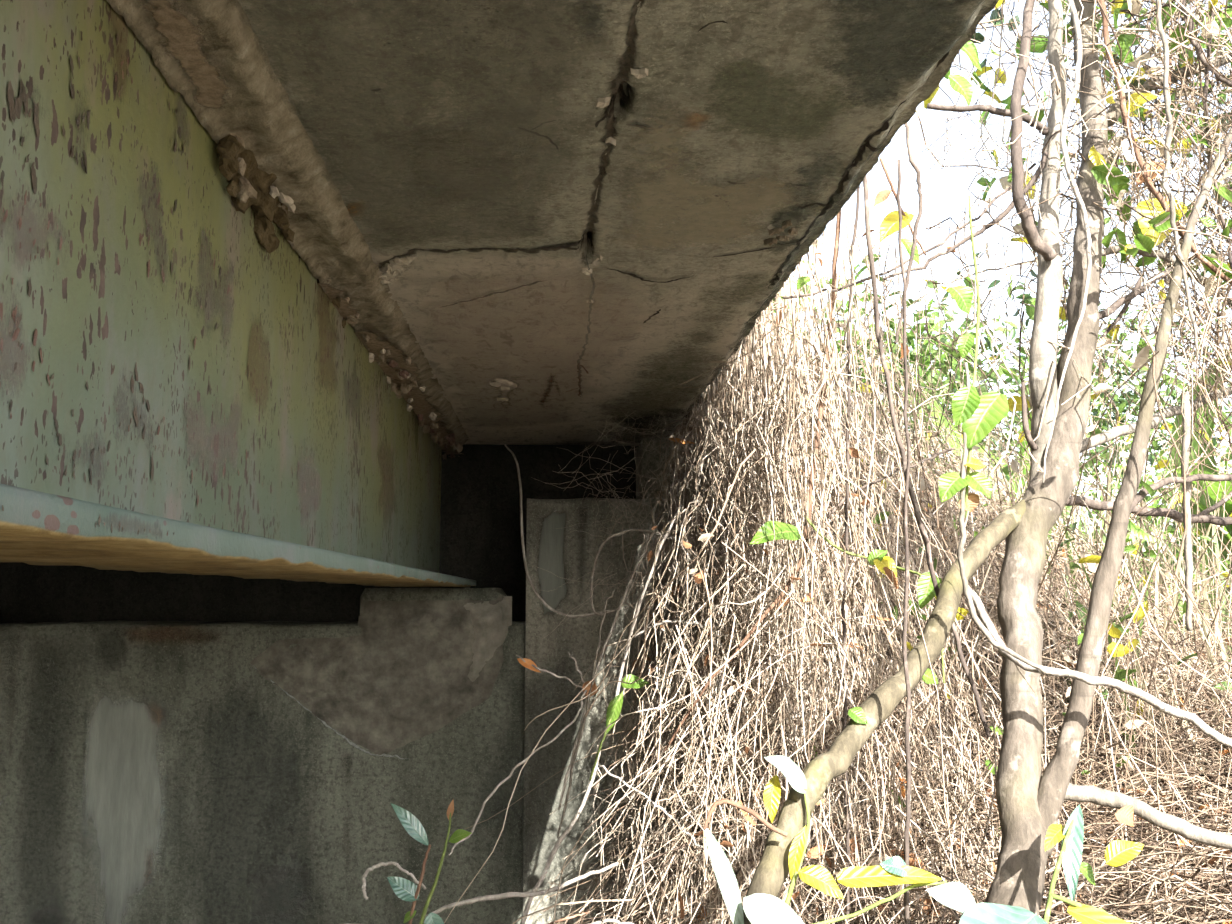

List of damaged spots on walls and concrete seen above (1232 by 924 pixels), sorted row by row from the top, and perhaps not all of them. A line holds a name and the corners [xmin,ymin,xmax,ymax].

spalling [142,0,230,109]
peeling [3,79,62,264]
peeling [63,110,91,174]
peeling [269,186,296,214]
crack [378,0,690,397]
crack [714,46,954,289]
peeling [0,277,54,386]
peeling [46,363,165,492]
leakage [83,692,167,924]